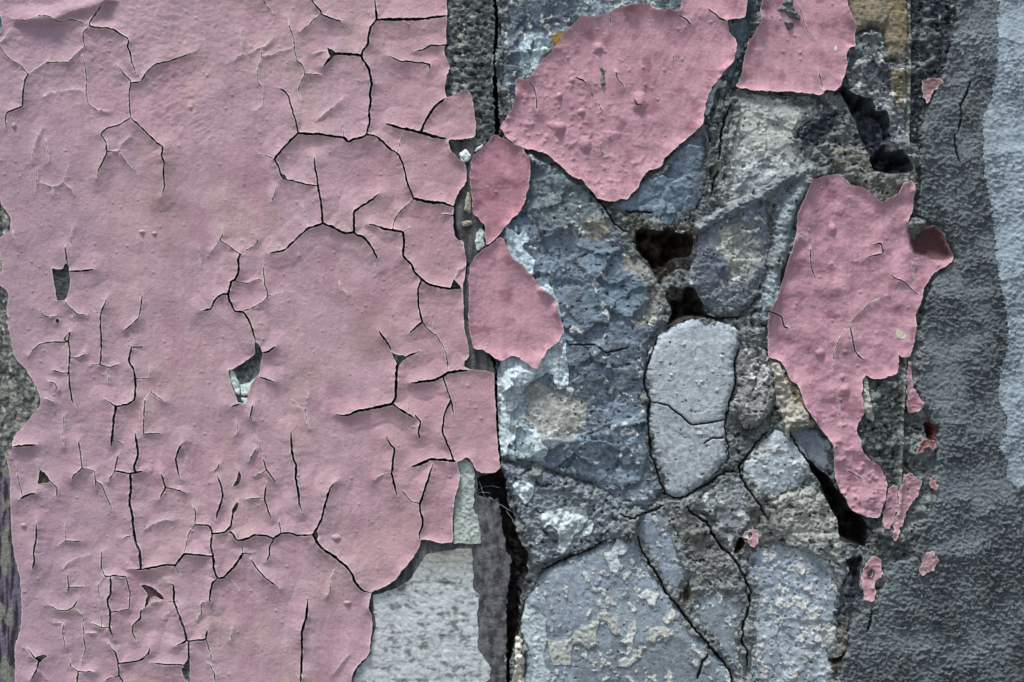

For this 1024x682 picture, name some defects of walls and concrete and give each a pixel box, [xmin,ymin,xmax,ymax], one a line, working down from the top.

peeling [52,263,71,300]
crack [1,15,185,189]
peeling [229,342,264,403]
crack [203,0,468,539]
peeling [450,0,857,369]
peeling [767,174,954,541]
peeling [922,78,943,103]
peeling [141,585,164,607]
crack [31,297,368,681]
crack [568,339,812,682]
peeling [861,556,883,602]
peeling [919,551,939,576]